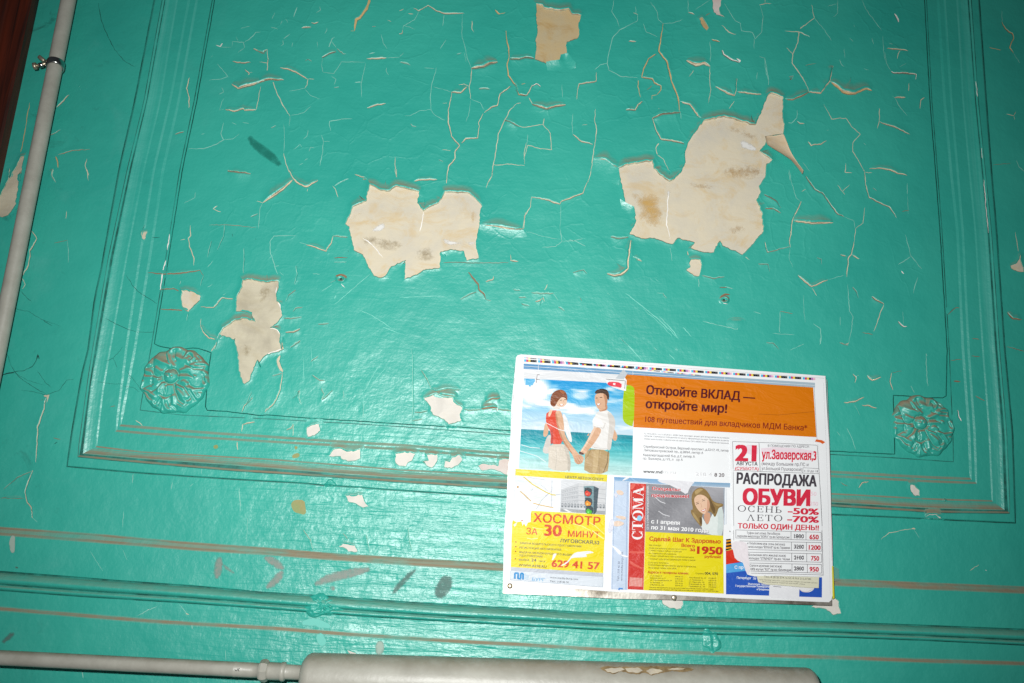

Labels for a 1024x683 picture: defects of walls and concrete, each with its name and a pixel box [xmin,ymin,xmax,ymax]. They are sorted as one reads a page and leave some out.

peeling [529,0,588,71]
peeling [0,151,28,221]
peeling [591,83,803,281]
peeling [340,175,527,285]
crack [148,0,986,450]
peeling [177,282,206,315]
peeling [214,270,288,389]
peeling [303,418,365,465]
peeling [419,388,467,429]
peeling [342,487,372,511]